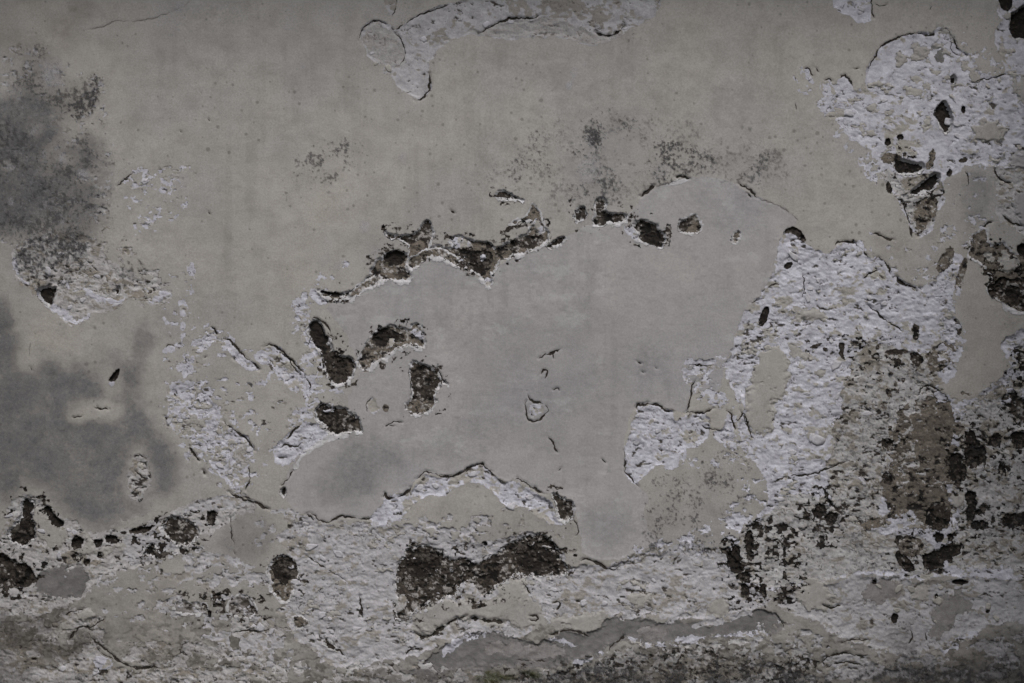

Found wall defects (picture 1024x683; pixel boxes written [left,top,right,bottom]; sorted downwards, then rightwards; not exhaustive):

damp [0,55,104,285]
peeling [359,0,661,101]
peeling [814,0,1024,239]
damp [0,312,173,519]
peeling [0,150,1024,683]